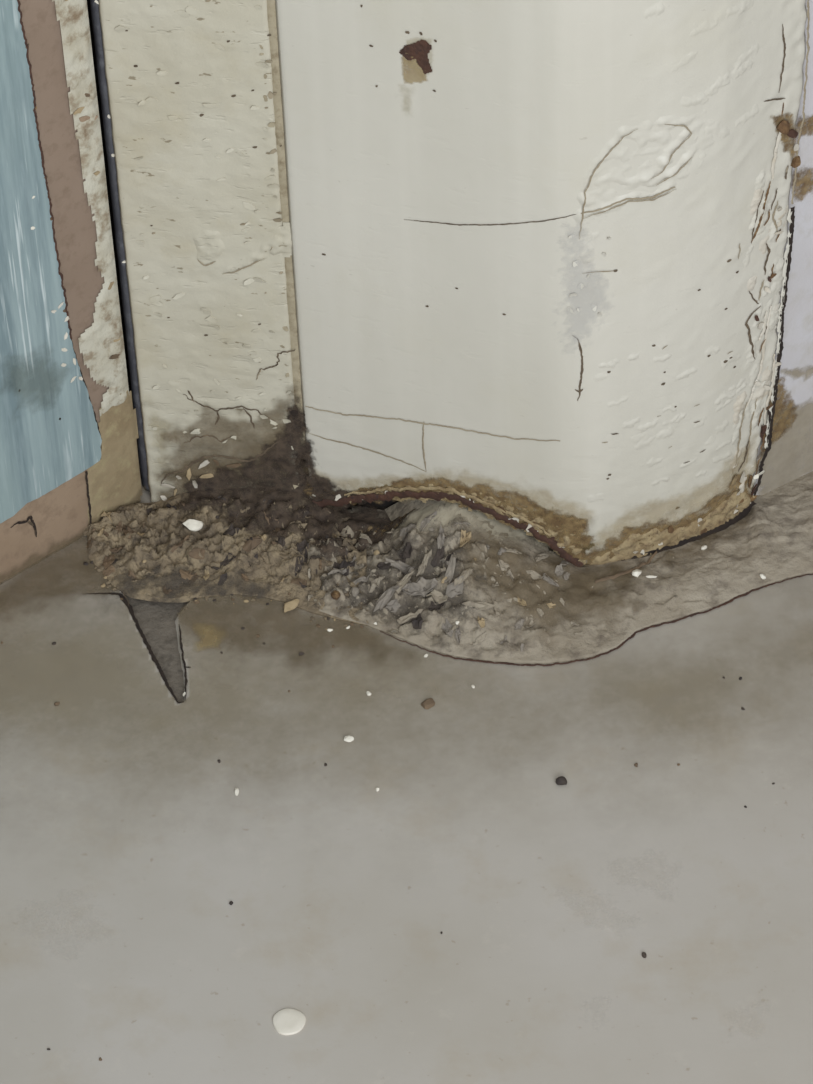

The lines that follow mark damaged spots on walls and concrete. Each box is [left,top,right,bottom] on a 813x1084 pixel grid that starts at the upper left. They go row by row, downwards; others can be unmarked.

spalling [17,0,83,383]
crack [412,187,676,226]
crack [753,0,810,501]
crack [256,350,295,380]
crack [183,391,275,443]
peeling [257,409,298,429]
crack [305,406,560,472]
water stain [160,399,632,627]
water stain [0,534,386,661]
peeling [411,601,461,643]
flaking render [386,502,570,617]
spalling [595,551,657,583]